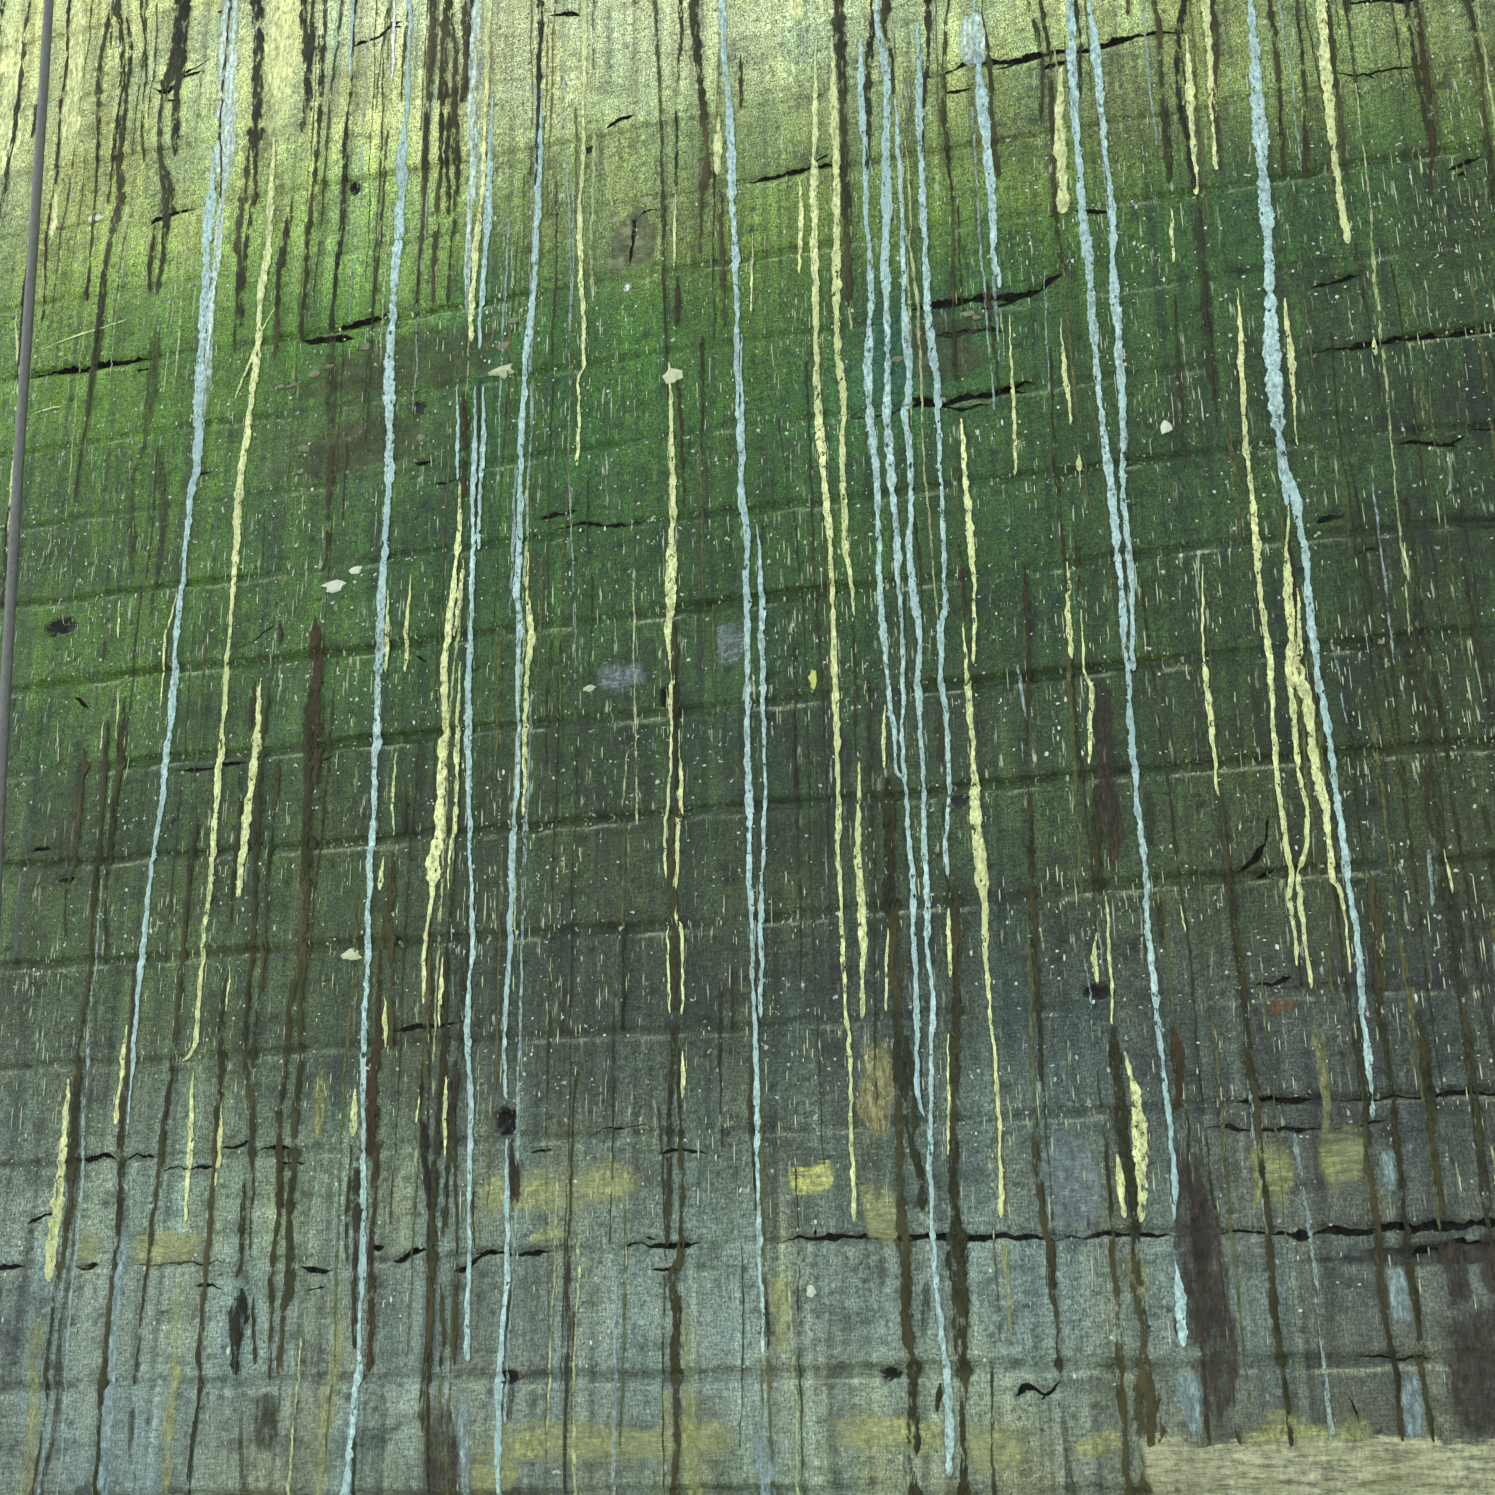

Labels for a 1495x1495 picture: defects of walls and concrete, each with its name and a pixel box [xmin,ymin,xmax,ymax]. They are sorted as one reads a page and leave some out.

damp [170,0,192,156]
damp [264,0,316,132]
damp [415,0,474,318]
damp [476,386,487,549]
damp [718,0,743,512]
damp [827,32,902,779]
damp [1073,0,1136,671]
crack [27,0,752,1495]
damp [673,729,684,888]
damp [674,906,684,1014]
damp [1105,895,1114,1024]
crack [739,0,1495,1495]